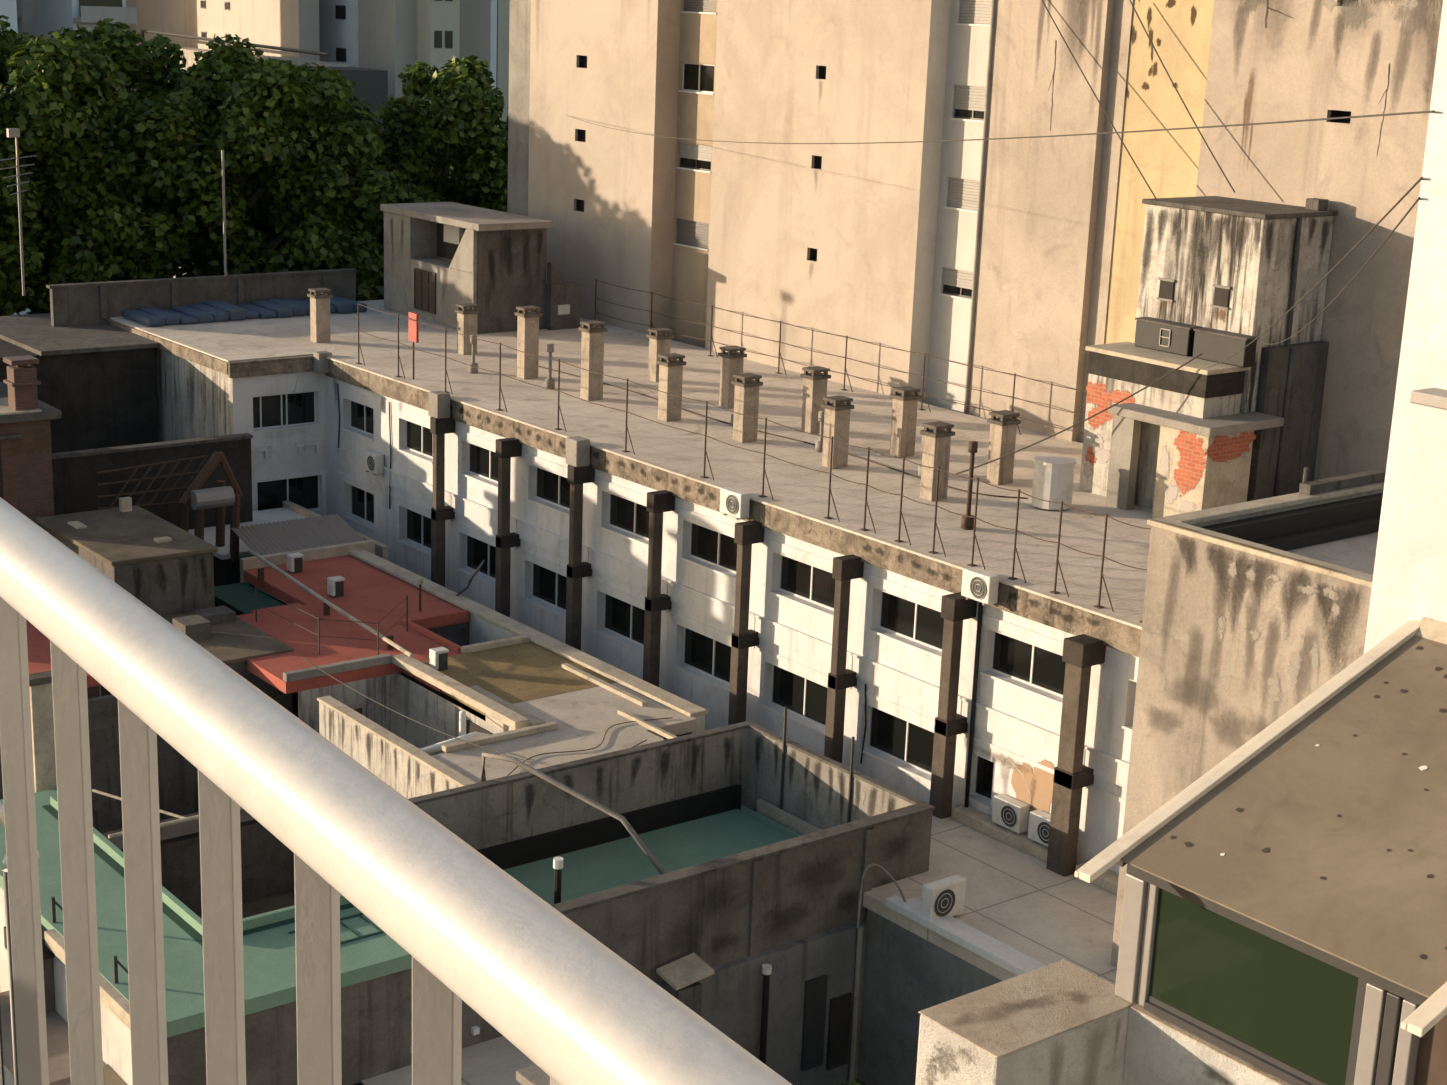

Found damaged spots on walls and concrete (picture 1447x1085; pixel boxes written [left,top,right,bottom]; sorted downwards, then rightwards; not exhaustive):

water stain [1141,211,1273,290]
water stain [1291,220,1328,270]
flaking render [1084,380,1135,477]
flaking render [1160,431,1256,514]
water stain [1178,538,1274,670]
water stain [1284,572,1358,658]
water stain [756,738,894,814]
water stain [926,1042,975,1085]